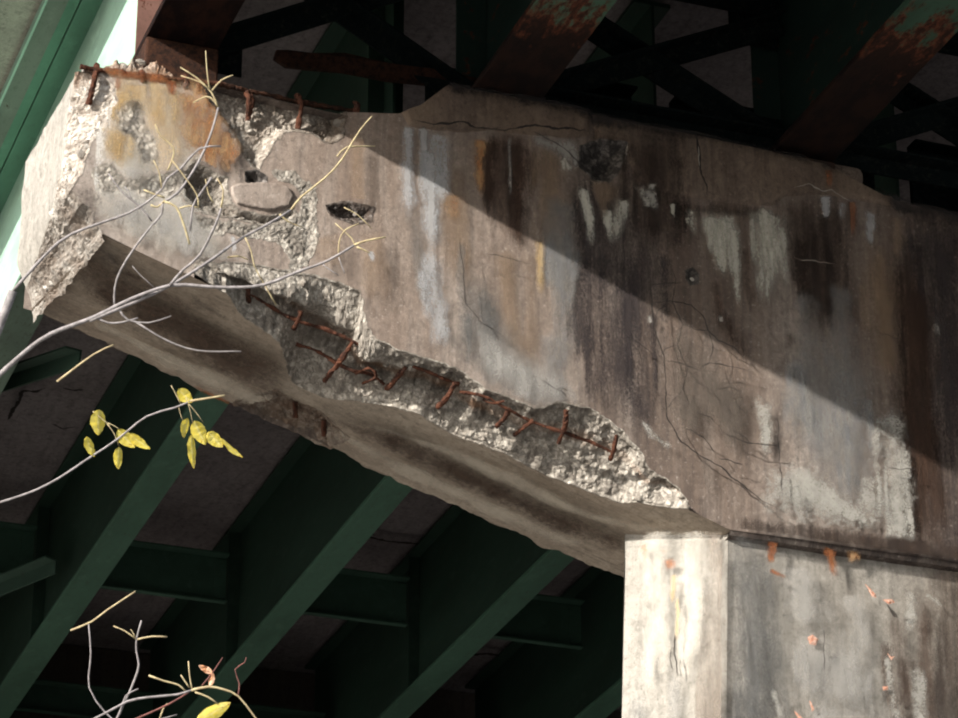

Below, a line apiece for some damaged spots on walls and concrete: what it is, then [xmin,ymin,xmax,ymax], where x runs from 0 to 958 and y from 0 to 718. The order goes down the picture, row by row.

rust [103,70,239,166]
efflorescence [402,127,450,240]
crack [415,120,592,174]
spalling [26,58,690,510]
efflorescence [418,257,449,341]
damp [484,131,740,445]
crack [615,252,783,511]
damp [741,197,958,557]
damp [681,574,702,662]
damp [695,664,722,718]
damp [882,573,957,718]